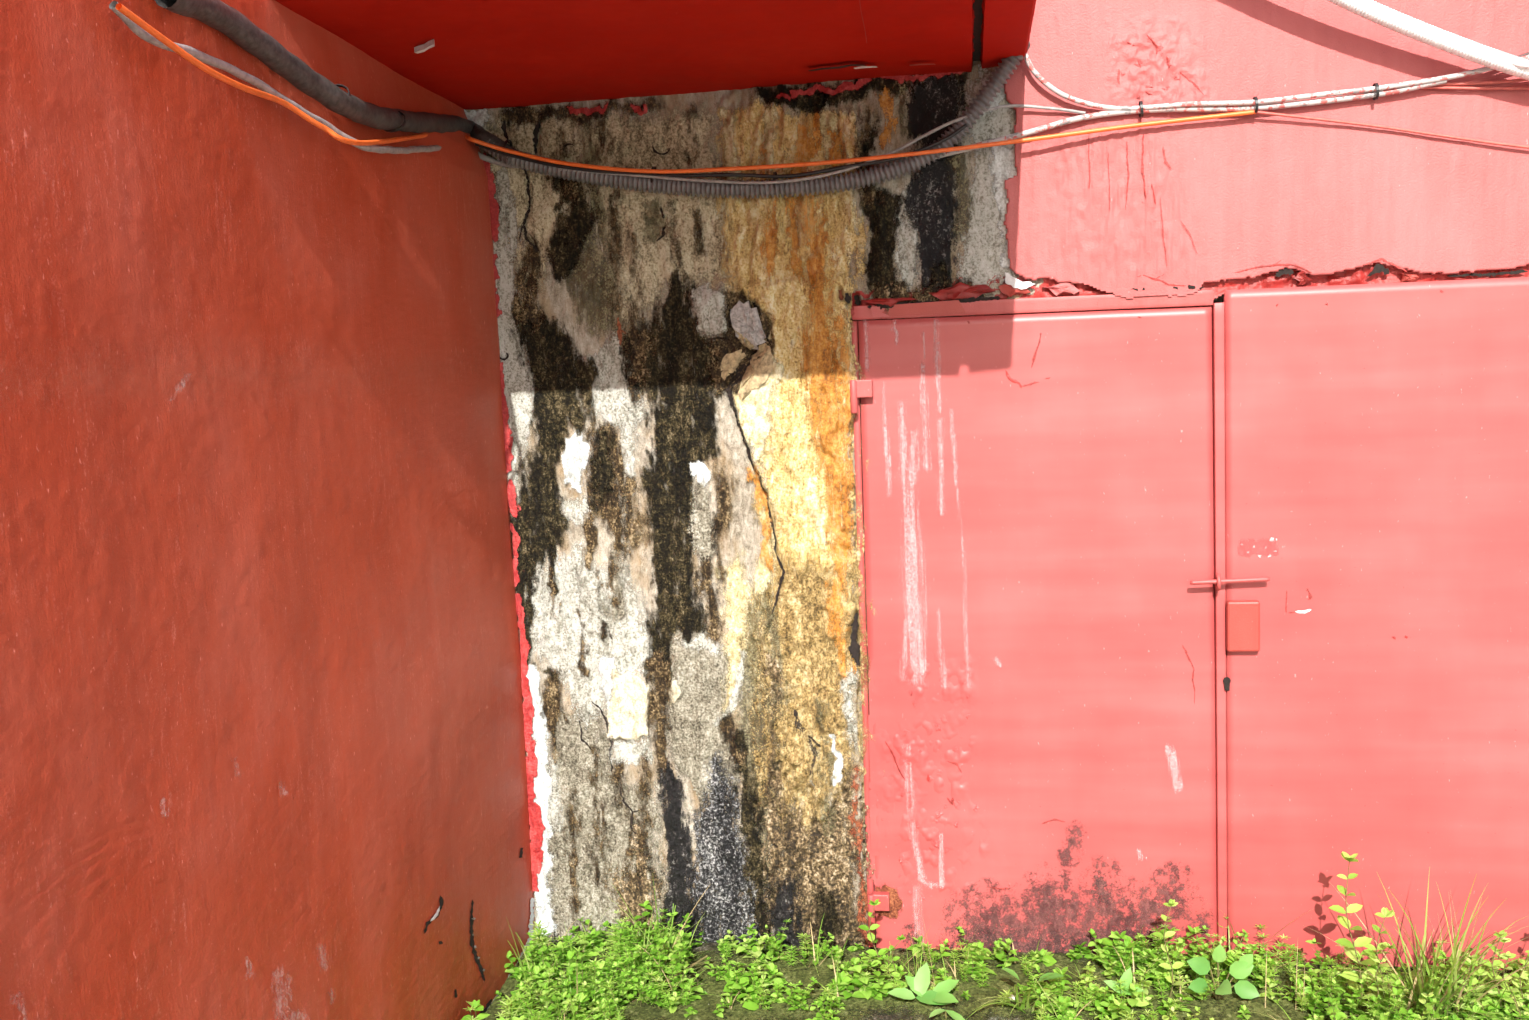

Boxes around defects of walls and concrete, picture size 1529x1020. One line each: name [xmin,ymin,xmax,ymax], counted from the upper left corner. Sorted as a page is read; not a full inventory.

damp [464,64,1017,947]
crack [708,302,785,614]
corrosion [746,465,774,573]
corrosion [760,112,857,679]
spalling [1173,263,1529,300]
damp [912,815,1212,954]